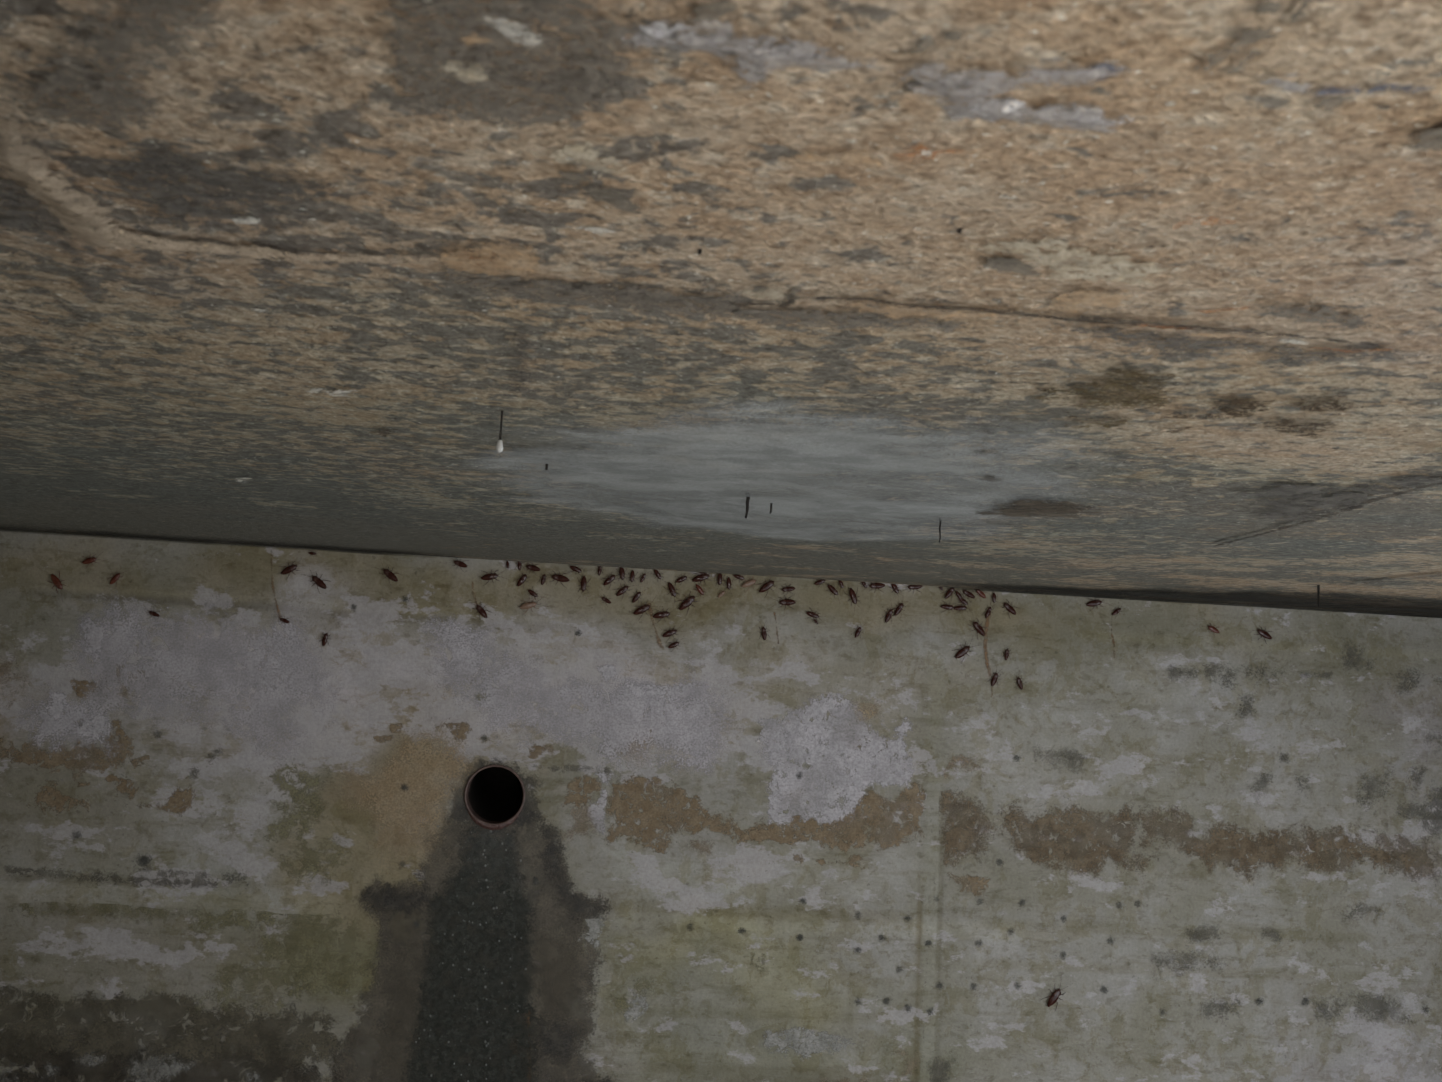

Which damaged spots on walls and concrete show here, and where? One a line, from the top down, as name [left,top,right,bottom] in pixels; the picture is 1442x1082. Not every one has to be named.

crack [736,296,1392,353]
crack [1215,482,1442,546]
leakage [0,718,1442,1082]